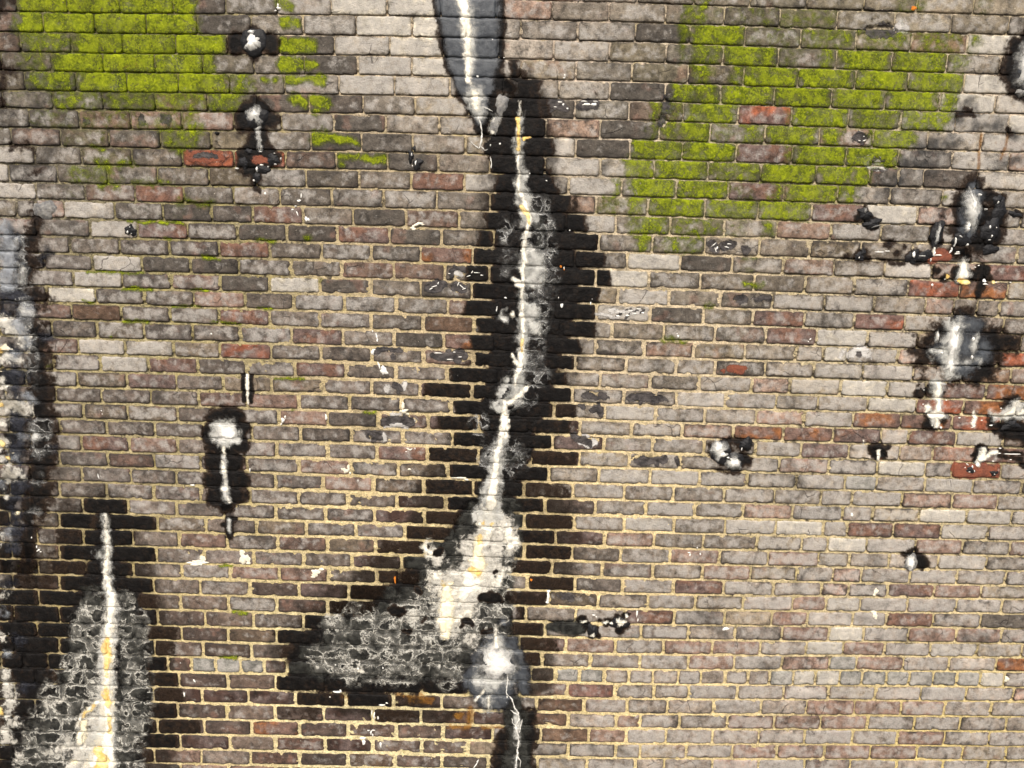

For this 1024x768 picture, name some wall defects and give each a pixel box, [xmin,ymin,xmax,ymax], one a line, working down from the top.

water stain [954,99,1017,139]
water stain [8,140,36,154]
water stain [887,139,959,191]
water stain [272,0,612,768]
water stain [925,382,944,428]
water stain [993,402,1024,417]
water stain [976,448,998,467]
water stain [0,200,201,768]
water stain [220,516,238,540]